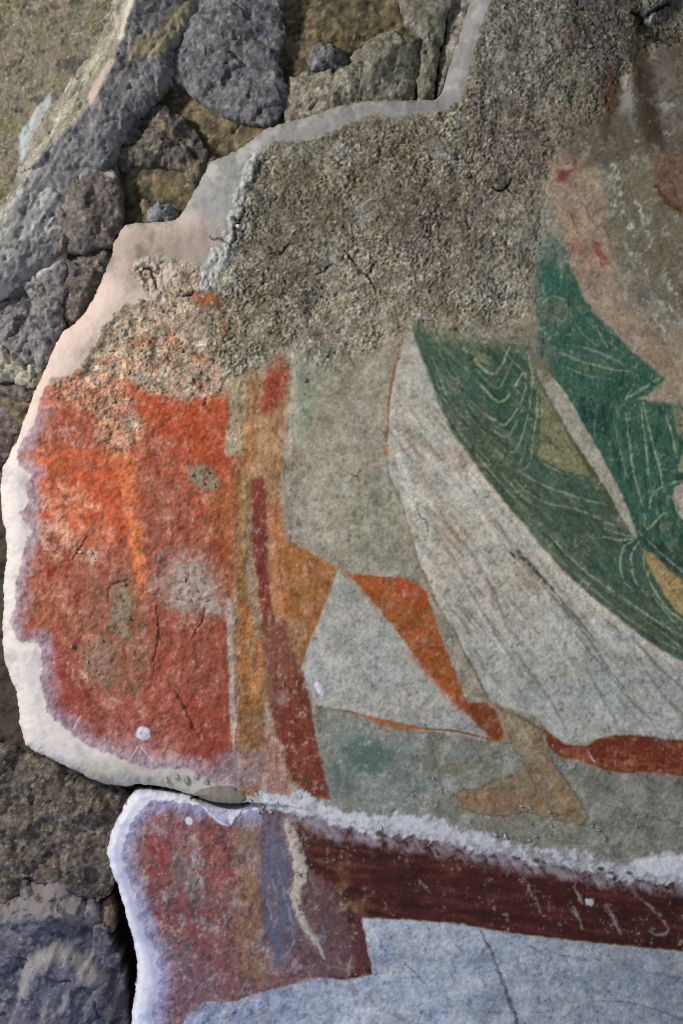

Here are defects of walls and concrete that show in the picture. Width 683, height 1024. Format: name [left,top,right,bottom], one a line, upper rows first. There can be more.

spalling [58,0,683,451]
crack [133,773,279,814]